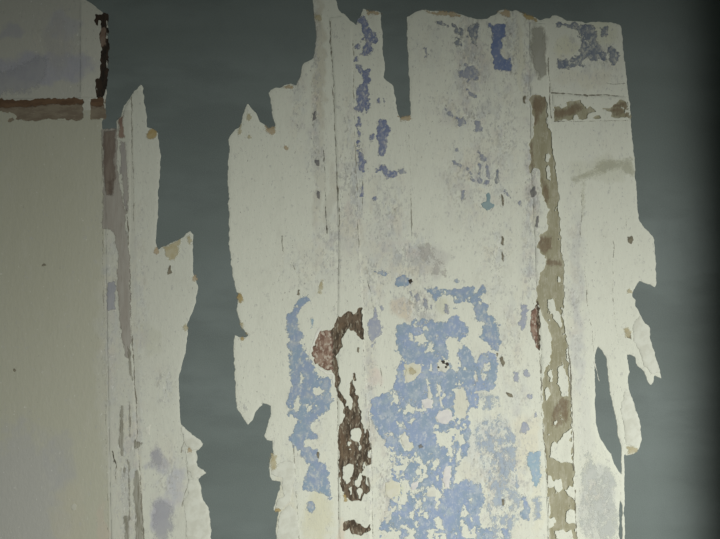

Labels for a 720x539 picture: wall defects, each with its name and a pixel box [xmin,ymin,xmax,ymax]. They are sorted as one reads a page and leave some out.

peeling [0,0,211,539]
peeling [228,0,661,539]